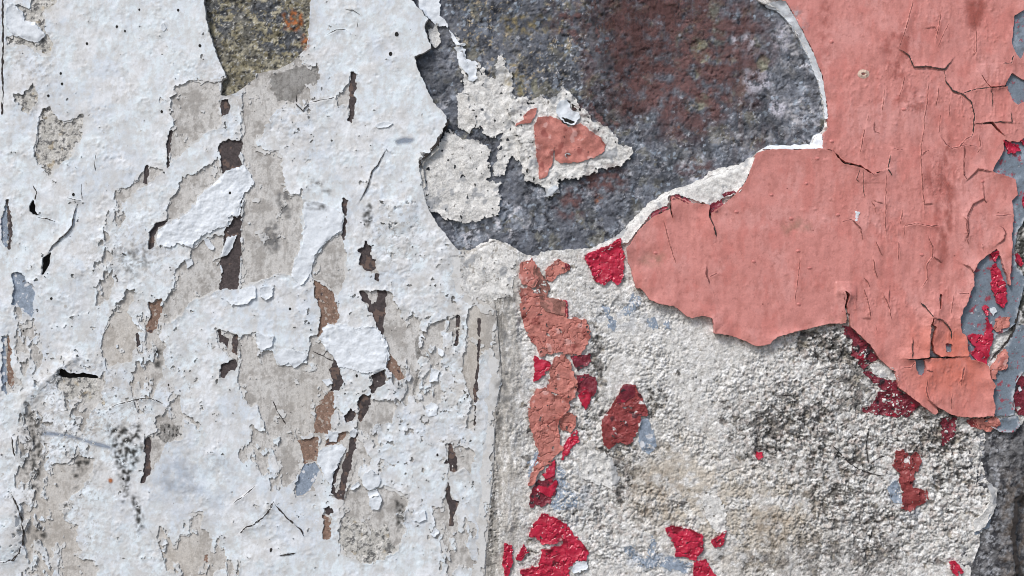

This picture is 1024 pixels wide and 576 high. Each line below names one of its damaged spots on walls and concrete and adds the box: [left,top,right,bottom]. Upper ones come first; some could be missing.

spalling [5,0,57,54]
peeling [1,199,13,250]
spalling [14,85,84,175]
crack [830,3,1014,411]
peeling [1003,139,1024,154]
peeling [1,272,49,395]
peeling [57,0,497,576]
spalling [412,0,828,576]
peeling [842,326,920,417]
peeling [967,251,1010,379]
peeling [15,404,99,576]